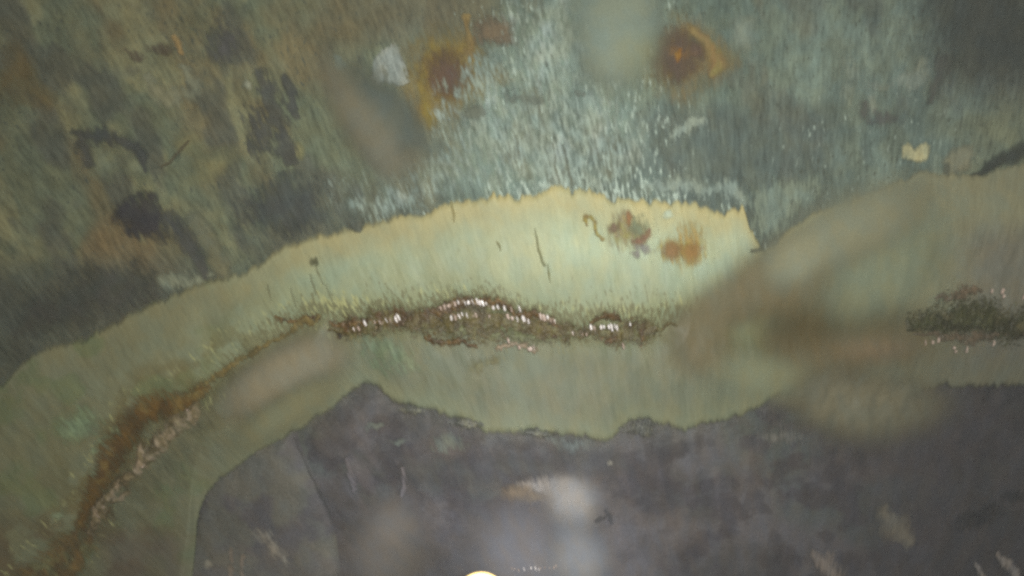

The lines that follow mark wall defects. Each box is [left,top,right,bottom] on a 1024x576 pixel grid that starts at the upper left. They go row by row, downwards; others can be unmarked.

corrosion [410,14,514,122]
corrosion [657,24,727,91]
corrosion [583,211,706,264]